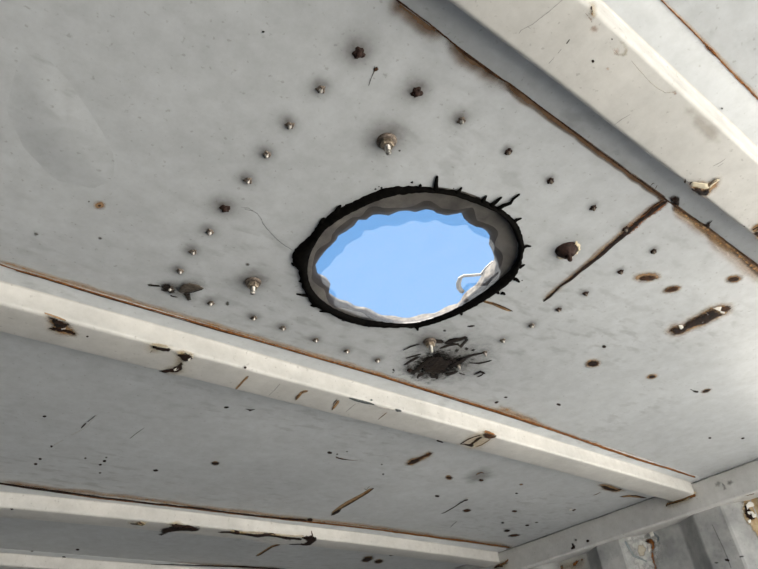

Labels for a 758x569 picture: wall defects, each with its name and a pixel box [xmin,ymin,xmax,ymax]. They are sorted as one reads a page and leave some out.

spalling [684,179,719,196]
rust [555,242,578,259]
rust [671,306,731,335]
rust [0,264,695,478]
rust [0,483,509,556]